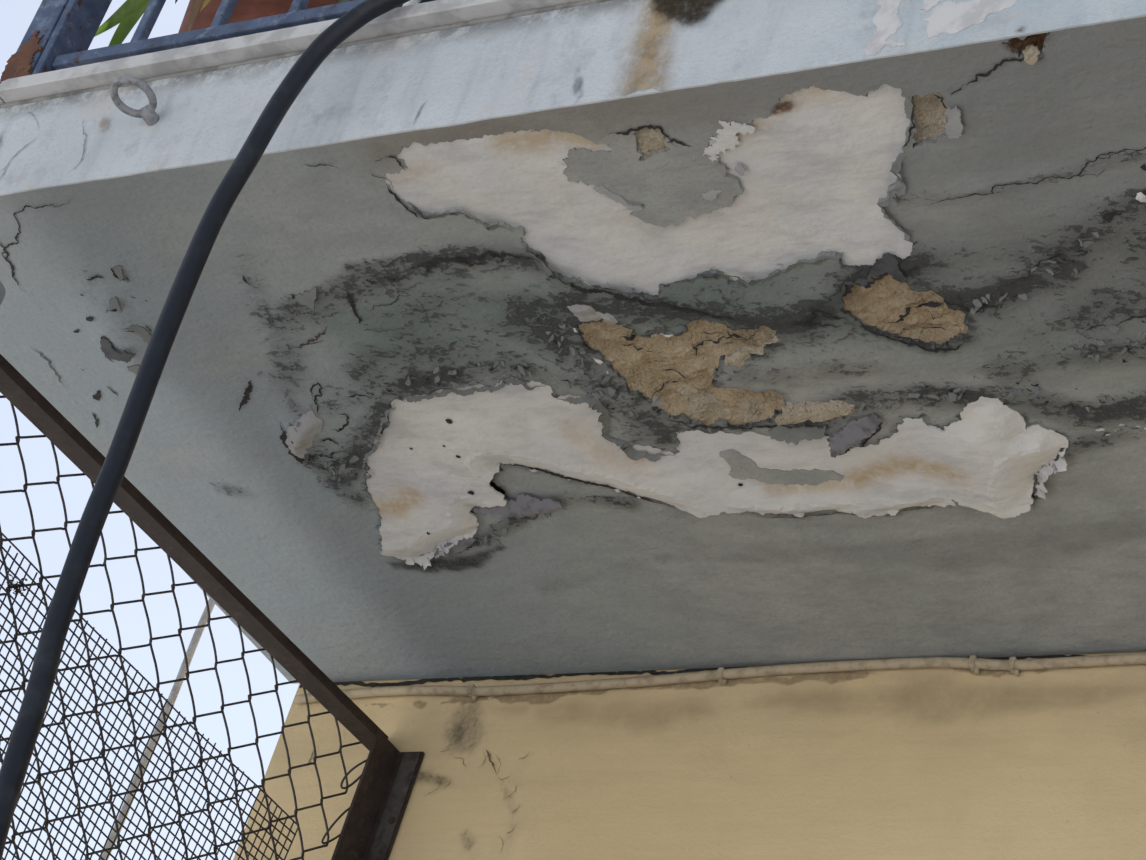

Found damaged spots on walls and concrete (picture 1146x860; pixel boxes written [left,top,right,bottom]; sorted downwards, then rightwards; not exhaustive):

corrosion [626,0,720,94]
peeling [863,0,905,57]
peeling [920,0,1018,38]
crack [951,53,1044,95]
spalling [1006,30,1046,65]
crack [0,112,39,178]
crack [73,121,87,169]
crack [919,147,1146,223]
crack [0,199,70,293]
peeling [385,84,1028,353]
peeling [1025,222,1105,275]
peeling [303,304,1070,570]